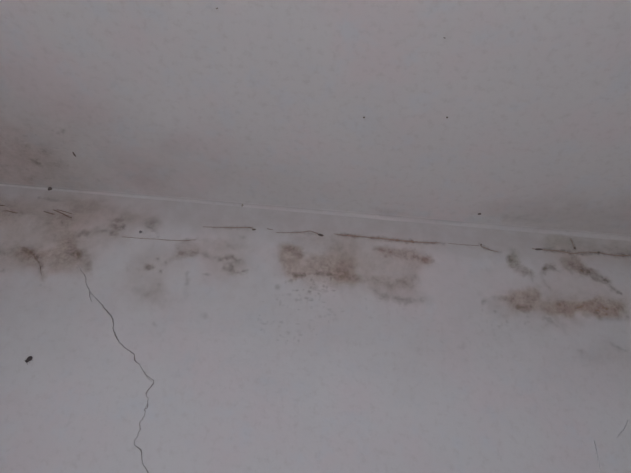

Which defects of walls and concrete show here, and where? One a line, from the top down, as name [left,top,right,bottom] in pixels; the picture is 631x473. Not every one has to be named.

crack [337,234,498,252]
crack [532,238,631,256]
crack [77,265,155,473]